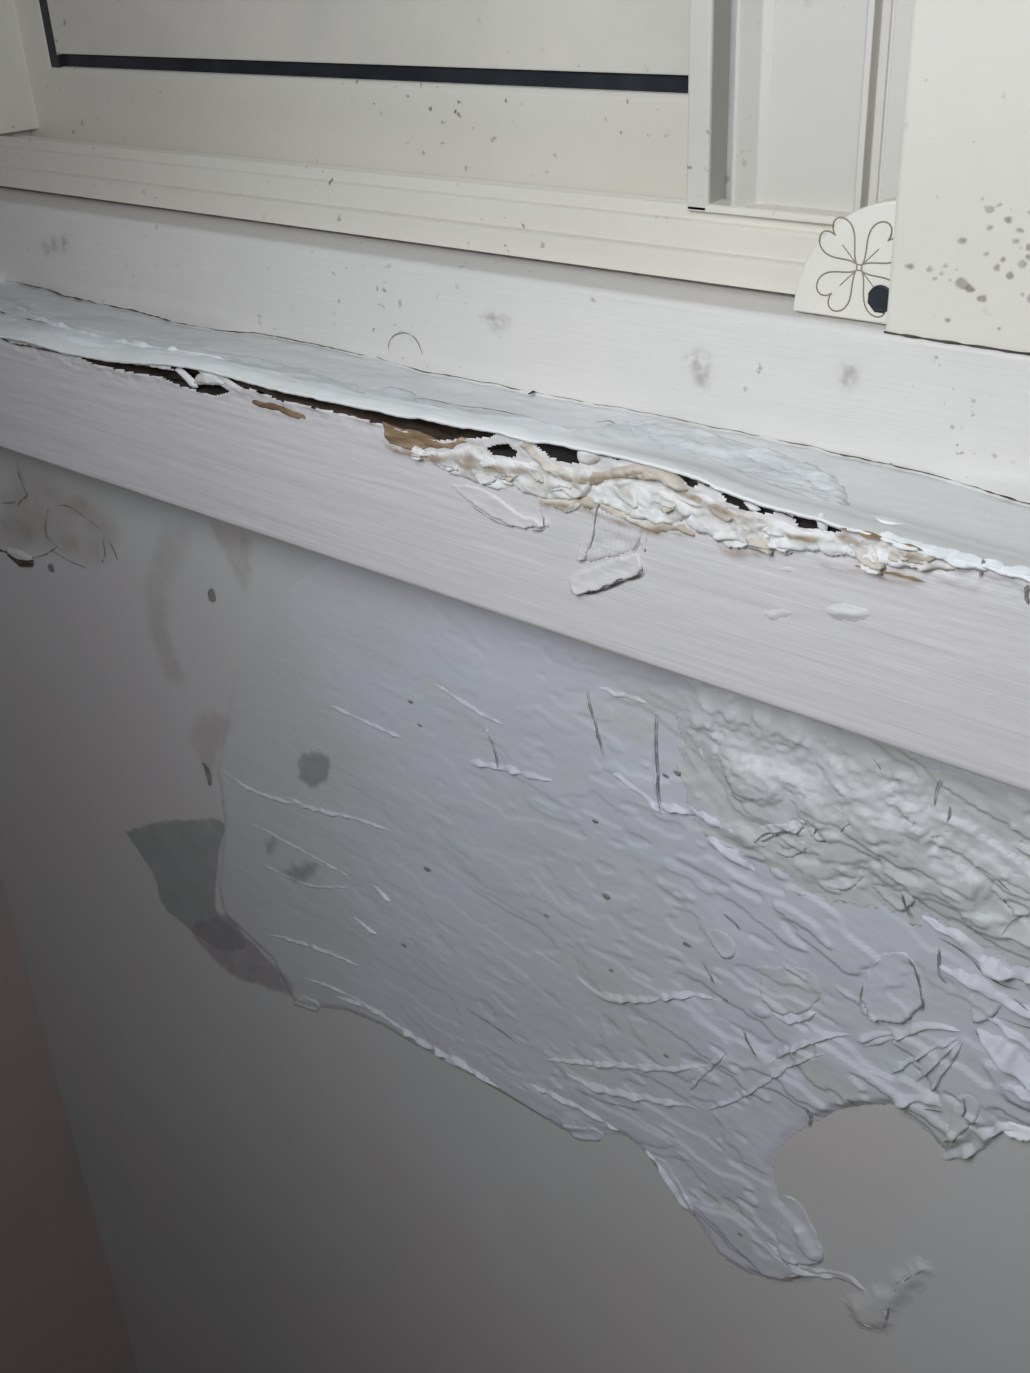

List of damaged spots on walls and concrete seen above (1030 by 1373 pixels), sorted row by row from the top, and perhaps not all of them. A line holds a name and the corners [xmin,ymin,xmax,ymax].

peeling [388,442,1030,595]
peeling [6,547,54,572]
crack [585,687,602,753]
crack [652,712,660,812]
crack [756,824,850,842]
crack [934,779,950,822]
crack [971,862,1019,934]
crack [908,937,1030,1037]